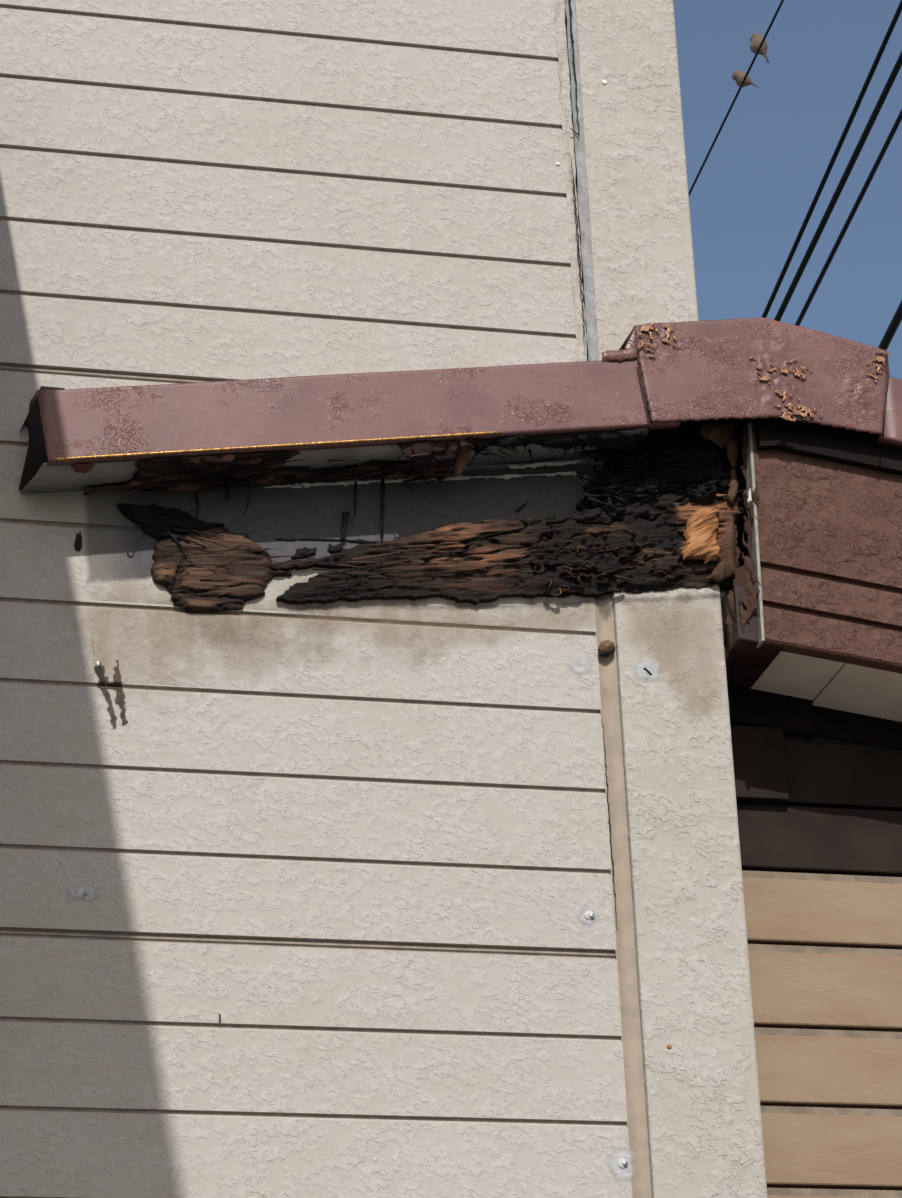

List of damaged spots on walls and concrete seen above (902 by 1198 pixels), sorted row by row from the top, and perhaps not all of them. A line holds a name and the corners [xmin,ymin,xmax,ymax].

peeling [109,464,596,578]
peeling [726,425,761,644]